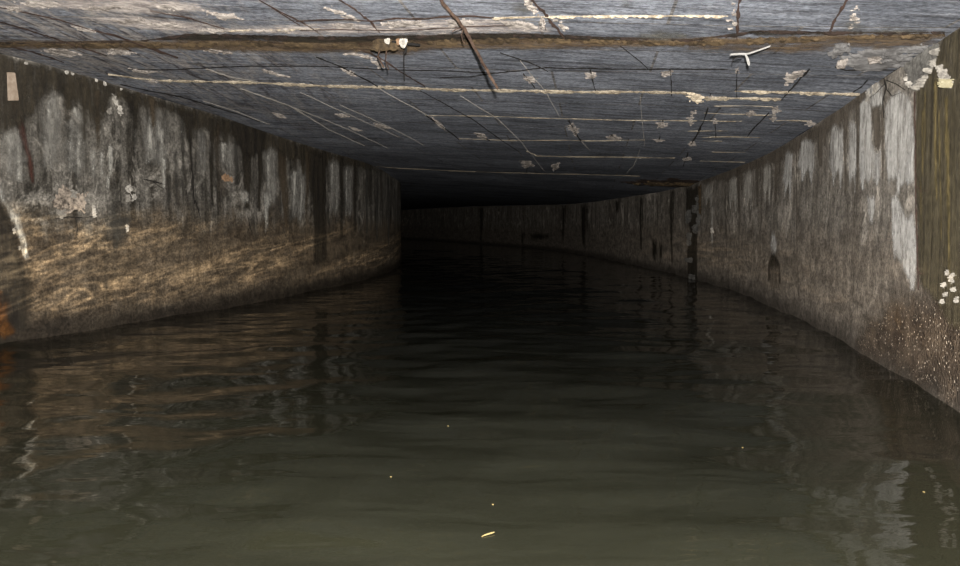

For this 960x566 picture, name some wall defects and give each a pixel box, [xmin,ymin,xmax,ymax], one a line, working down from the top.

crack [828,0,861,36]
crack [0,0,742,174]
crack [747,69,810,137]
spalling [827,38,954,90]
crack [189,128,201,219]
damp [0,23,950,289]